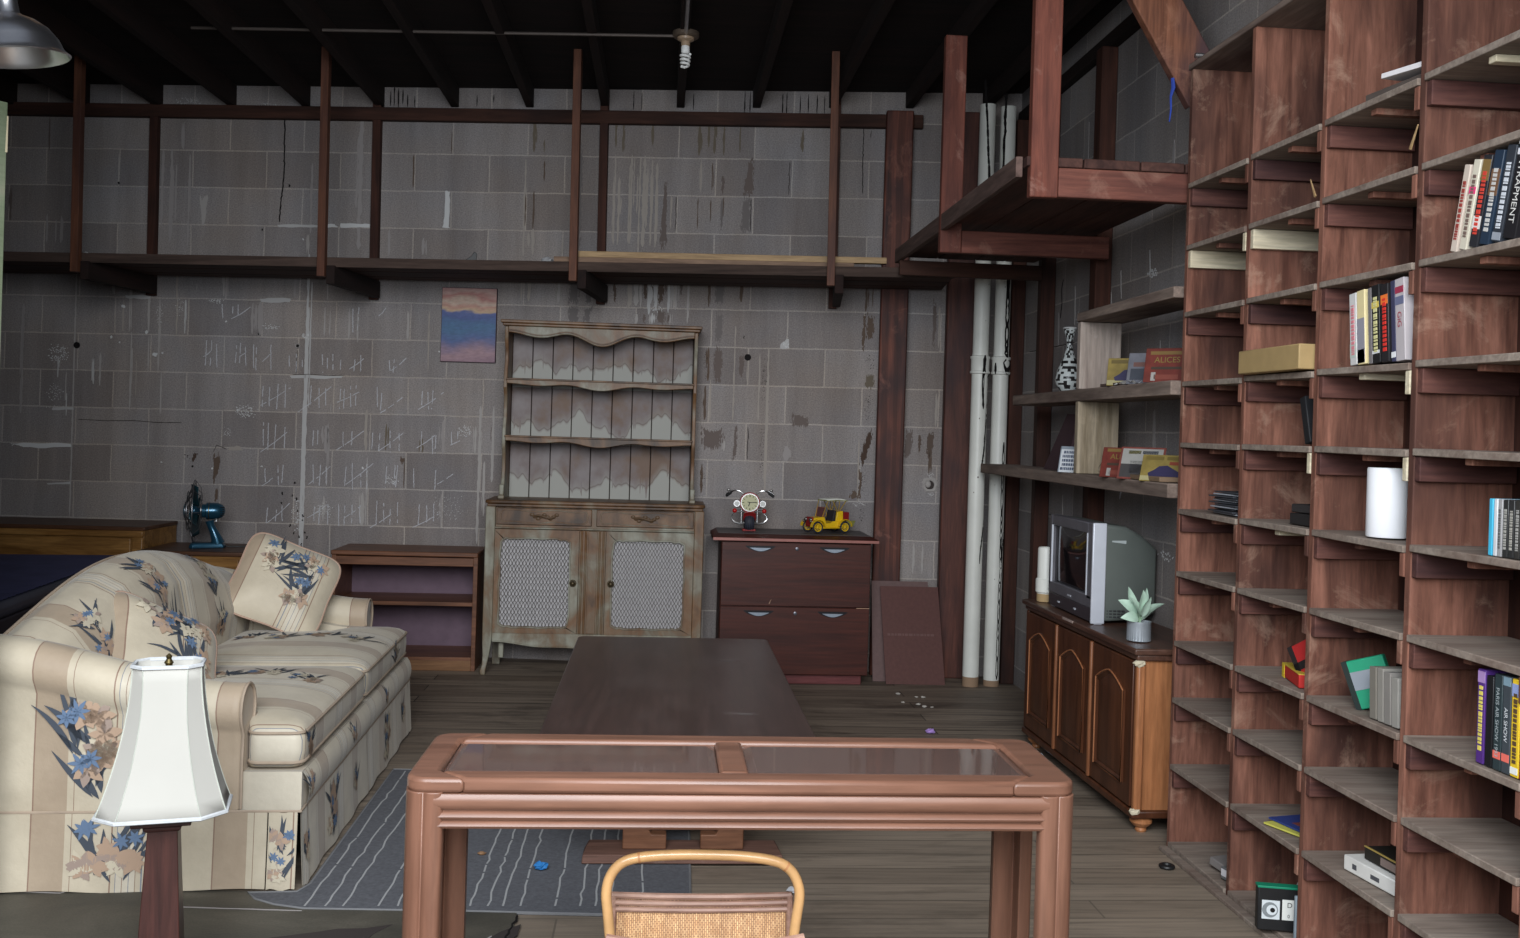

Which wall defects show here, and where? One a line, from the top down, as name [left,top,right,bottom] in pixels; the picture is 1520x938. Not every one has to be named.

water stain [611,155,673,250]
water stain [720,158,754,233]
water stain [904,394,939,496]